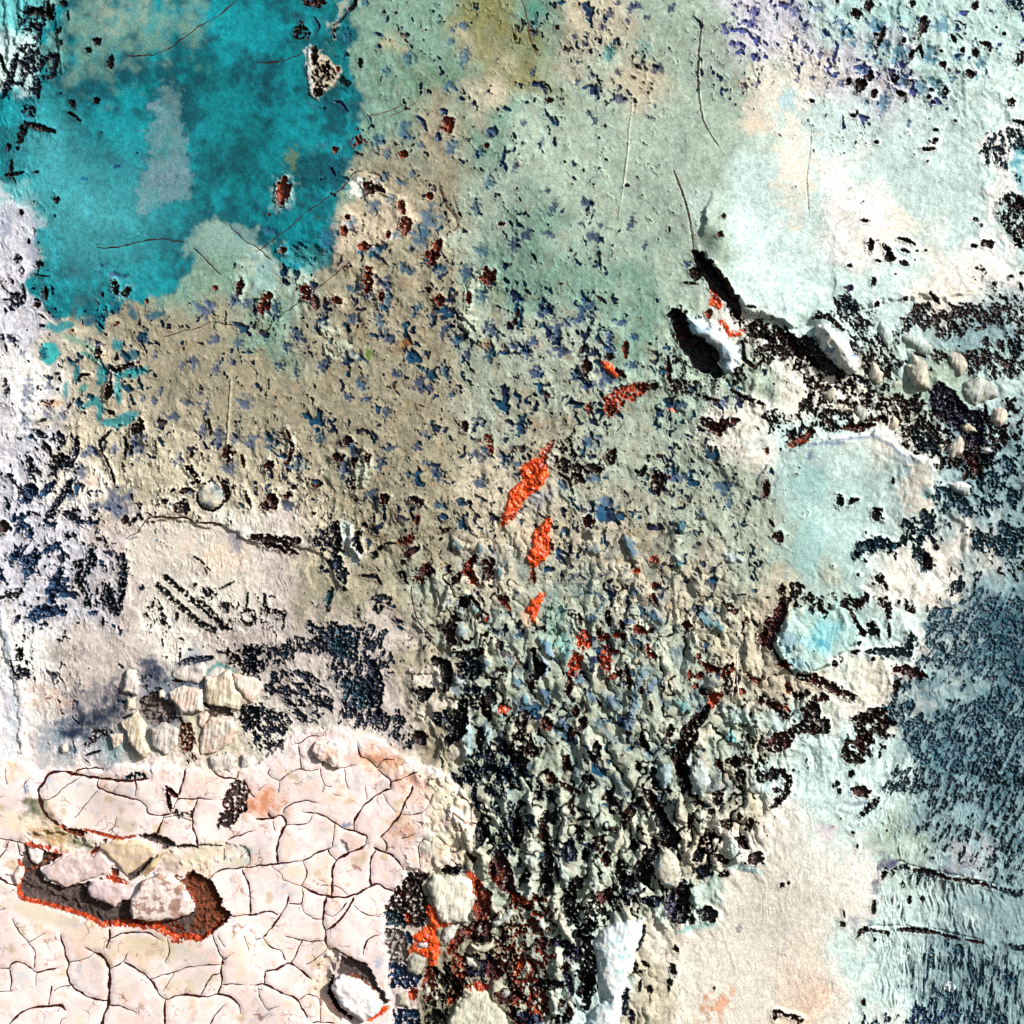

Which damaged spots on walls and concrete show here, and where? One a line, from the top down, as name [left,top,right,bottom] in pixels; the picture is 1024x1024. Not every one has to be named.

corrosion [600,361,648,417]
peeling [263,431,294,473]
corrosion [500,440,554,527]
corrosion [526,518,554,622]
spalling [328,250,1024,1024]
spalling [13,833,232,939]
crack [0,735,435,1024]
corrosion [406,871,557,1024]